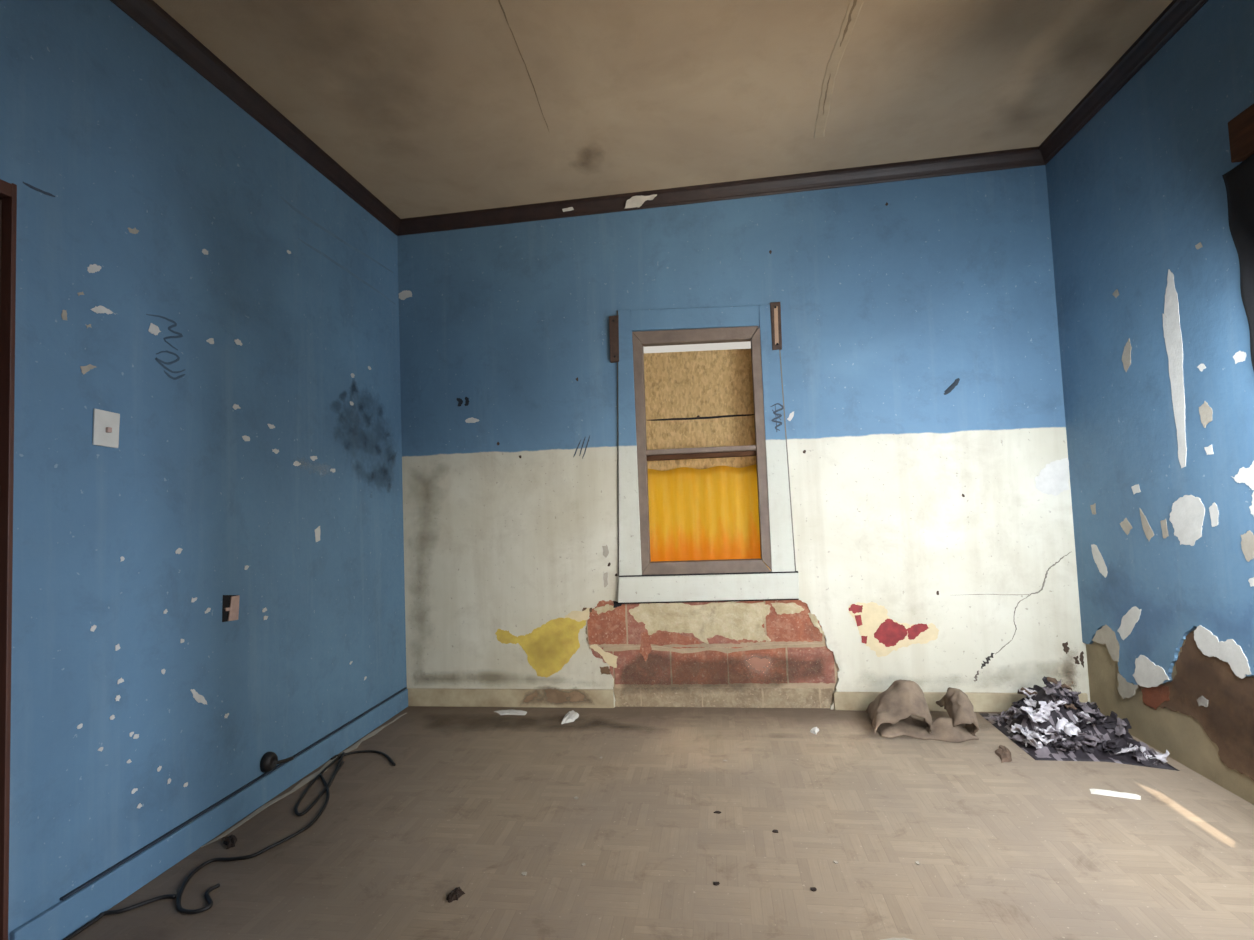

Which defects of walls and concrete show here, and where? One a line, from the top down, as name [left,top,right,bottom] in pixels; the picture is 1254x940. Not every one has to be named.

crack [498,0,549,131]
crack [813,0,864,138]
peeling [1162,269,1213,468]
spalling [495,545,839,708]
peeling [848,602,939,657]
crack [969,552,1070,653]
peeling [1091,544,1108,578]
peeling [1169,495,1219,546]
peeling [1231,461,1254,516]
peeling [1241,530,1254,562]
spalling [1092,606,1254,781]